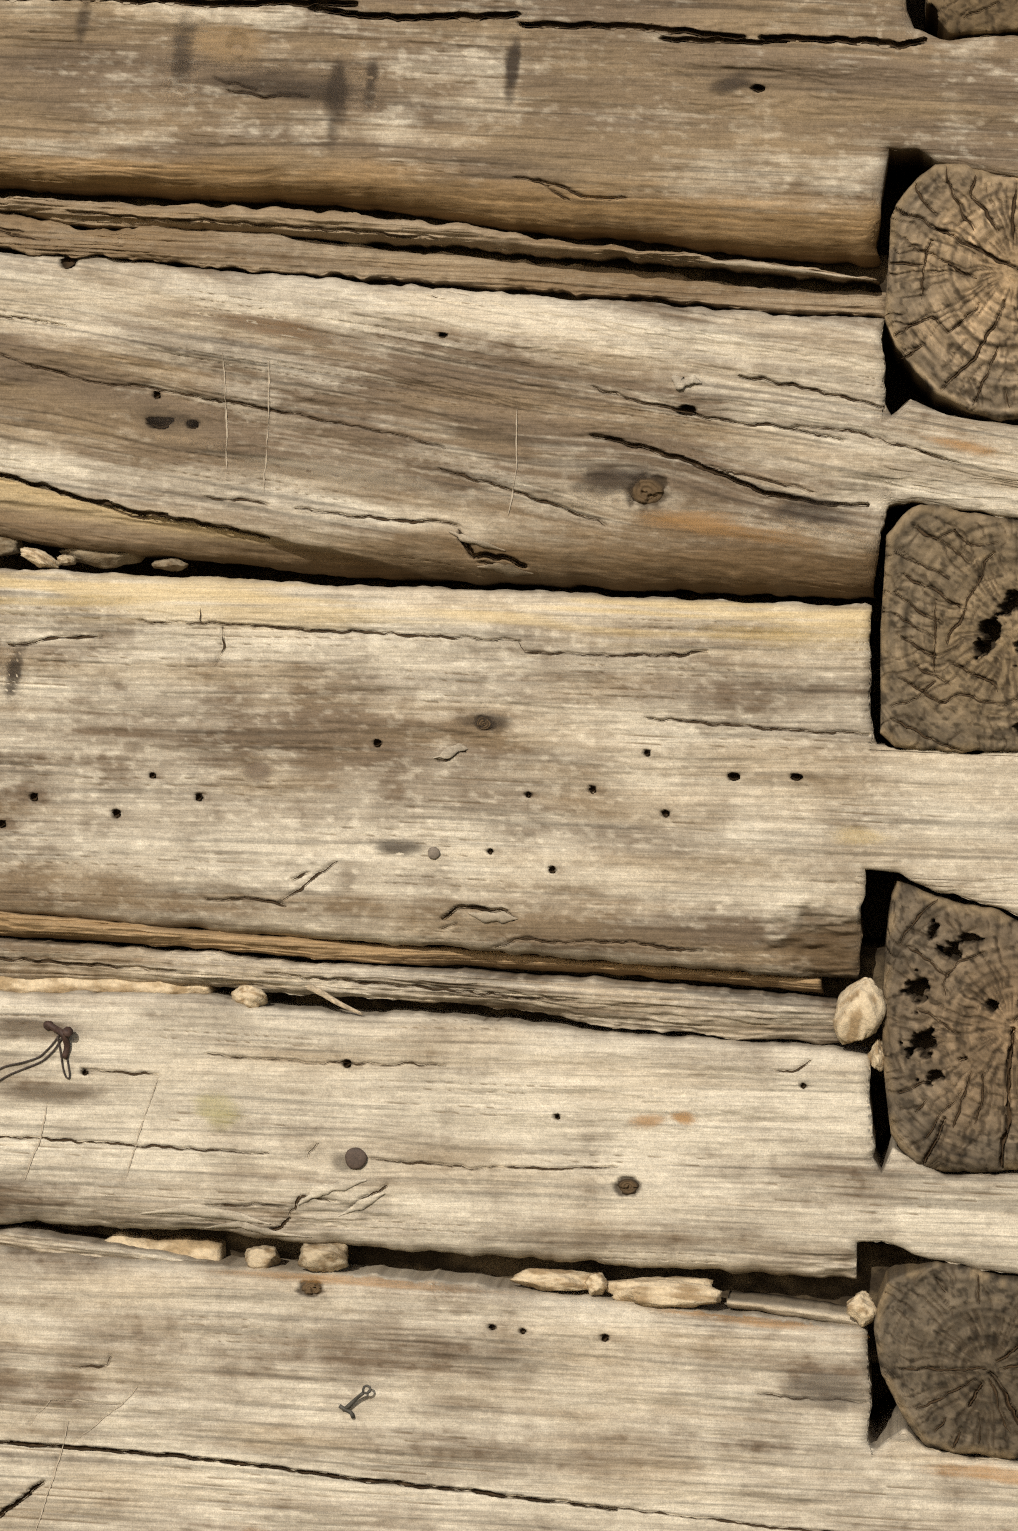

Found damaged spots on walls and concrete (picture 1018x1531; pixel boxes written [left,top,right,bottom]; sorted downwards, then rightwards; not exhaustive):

crack [8,0,924,49]
crack [593,376,957,463]
crack [592,435,870,506]
crack [0,473,525,567]
crack [206,861,337,906]
crack [214,1159,609,1230]
crack [0,1441,830,1531]